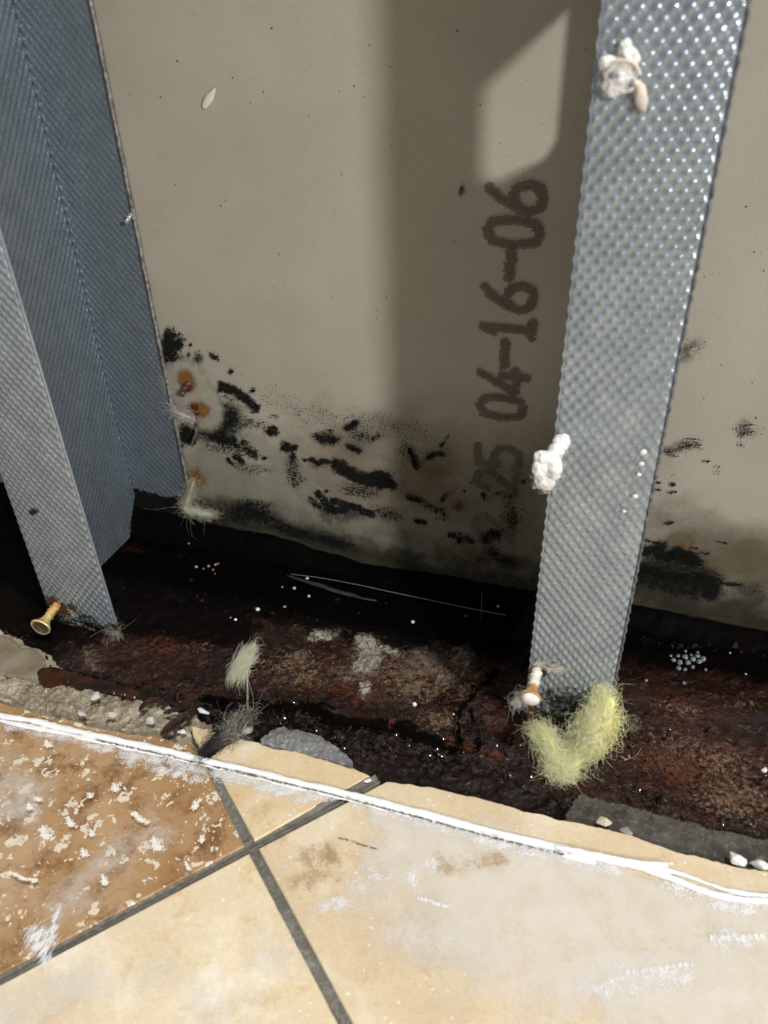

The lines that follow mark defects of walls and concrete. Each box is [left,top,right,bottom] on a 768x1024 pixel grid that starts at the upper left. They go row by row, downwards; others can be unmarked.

mould [158,325,219,365]
leakage [133,369,542,592]
corrosion [46,597,231,658]
leakage [632,539,768,631]
corrosion [138,696,196,736]
crack [197,667,499,755]
corrosion [251,645,504,760]
leakage [122,753,311,803]
corrosion [606,692,768,833]